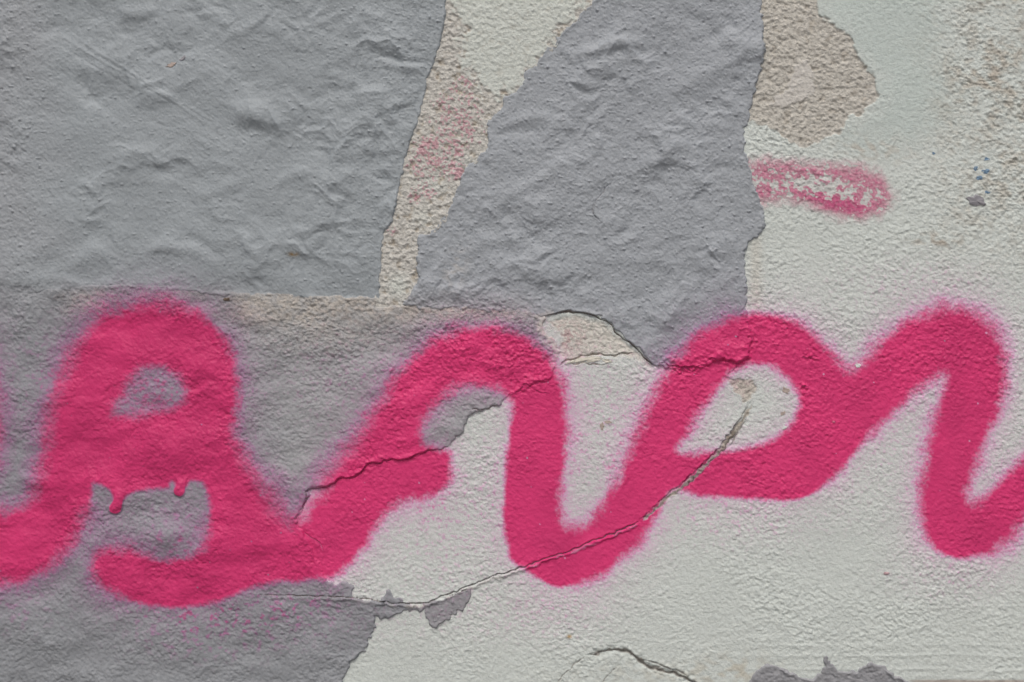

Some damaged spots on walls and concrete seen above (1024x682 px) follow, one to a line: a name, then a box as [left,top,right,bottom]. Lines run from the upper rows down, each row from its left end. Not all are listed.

peeling [748,0,881,149]
peeling [375,0,592,307]
peeling [545,314,652,369]
crack [472,309,753,412]
spalling [729,377,759,405]
crack [257,402,754,609]
peeling [408,589,471,628]
crack [557,645,698,682]
peeling [749,655,908,682]